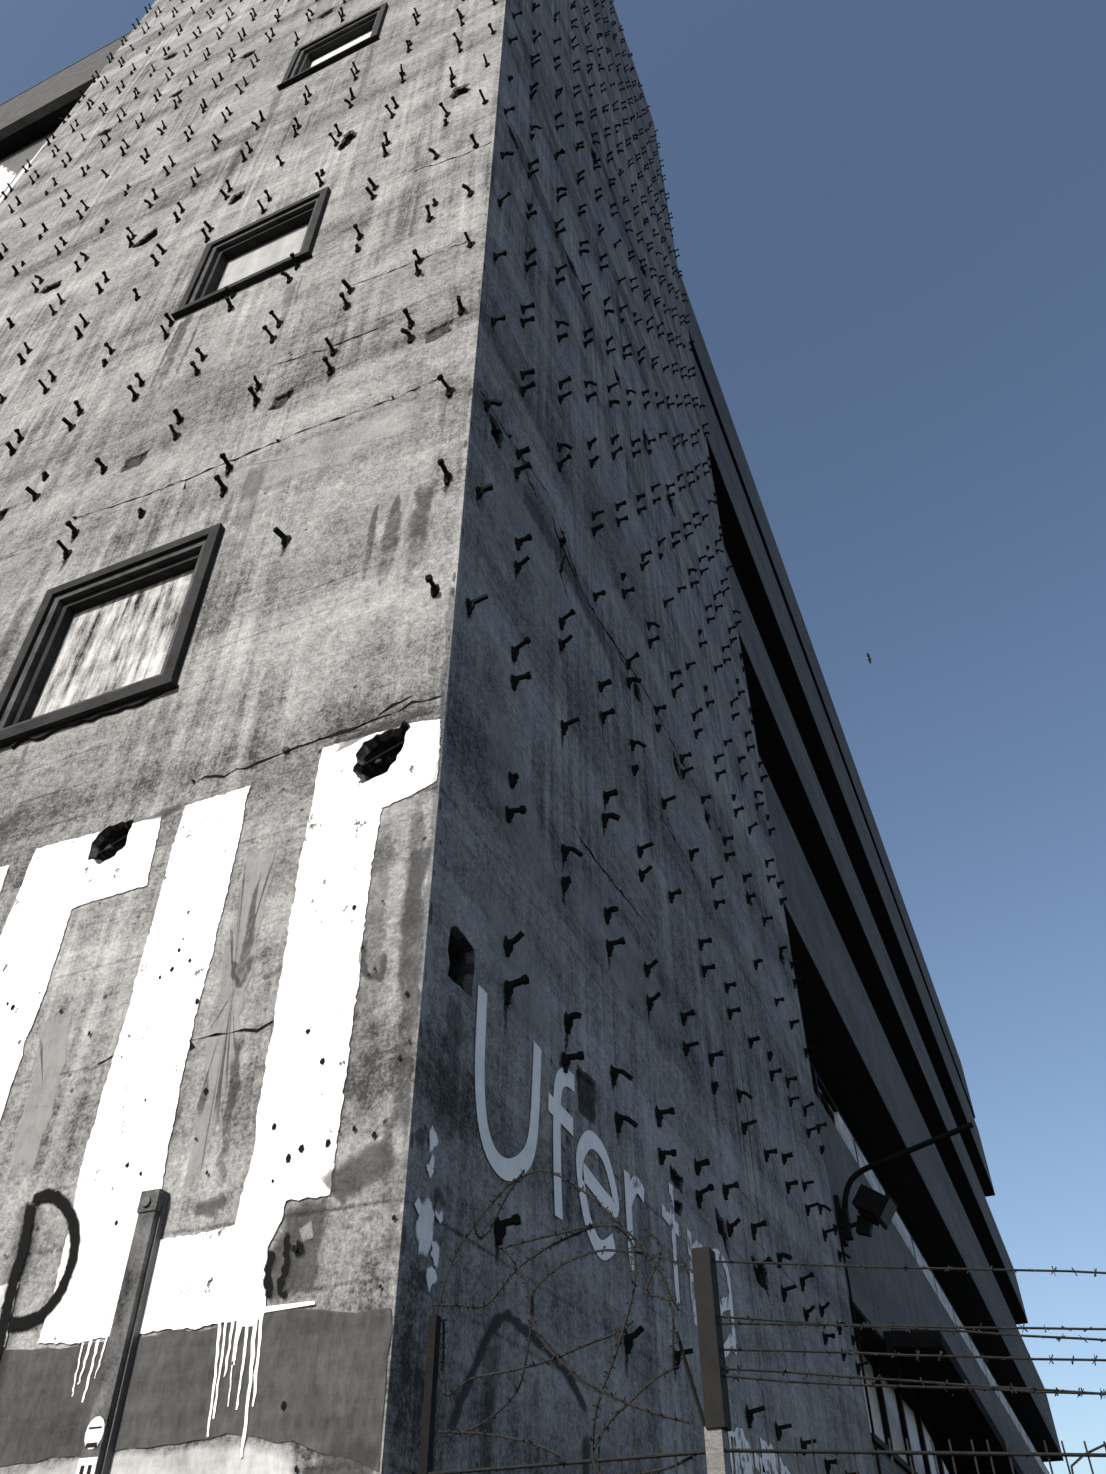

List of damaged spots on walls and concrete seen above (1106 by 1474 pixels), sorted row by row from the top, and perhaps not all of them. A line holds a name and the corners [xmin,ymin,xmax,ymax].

leakage [367,487,433,568]
crack [72,373,728,845]
spalling [339,706,424,784]
spalling [89,804,179,864]
crack [189,1020,273,1050]